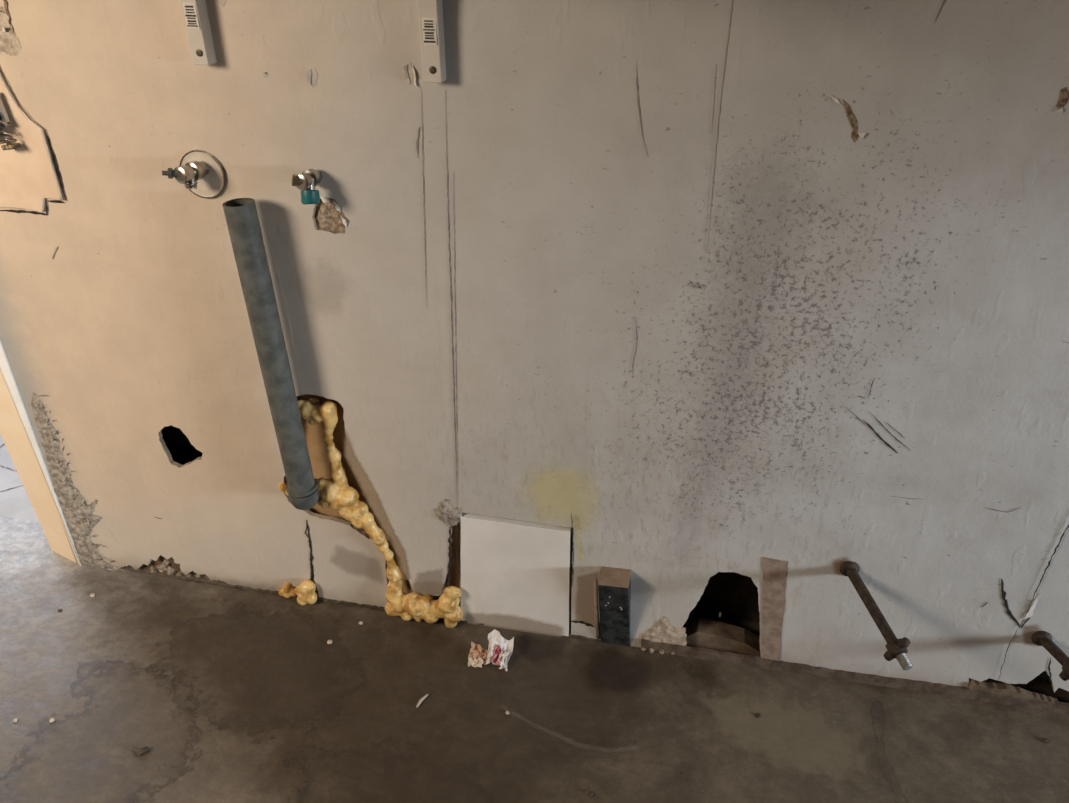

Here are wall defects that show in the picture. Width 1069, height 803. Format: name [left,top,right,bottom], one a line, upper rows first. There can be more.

crack [0,0,13,30]
spalling [0,7,21,56]
peeling [830,95,866,142]
peeling [1056,87,1069,113]
spalling [315,197,347,232]
spalling [30,392,130,572]
crack [304,520,313,581]
crack [980,525,1069,681]